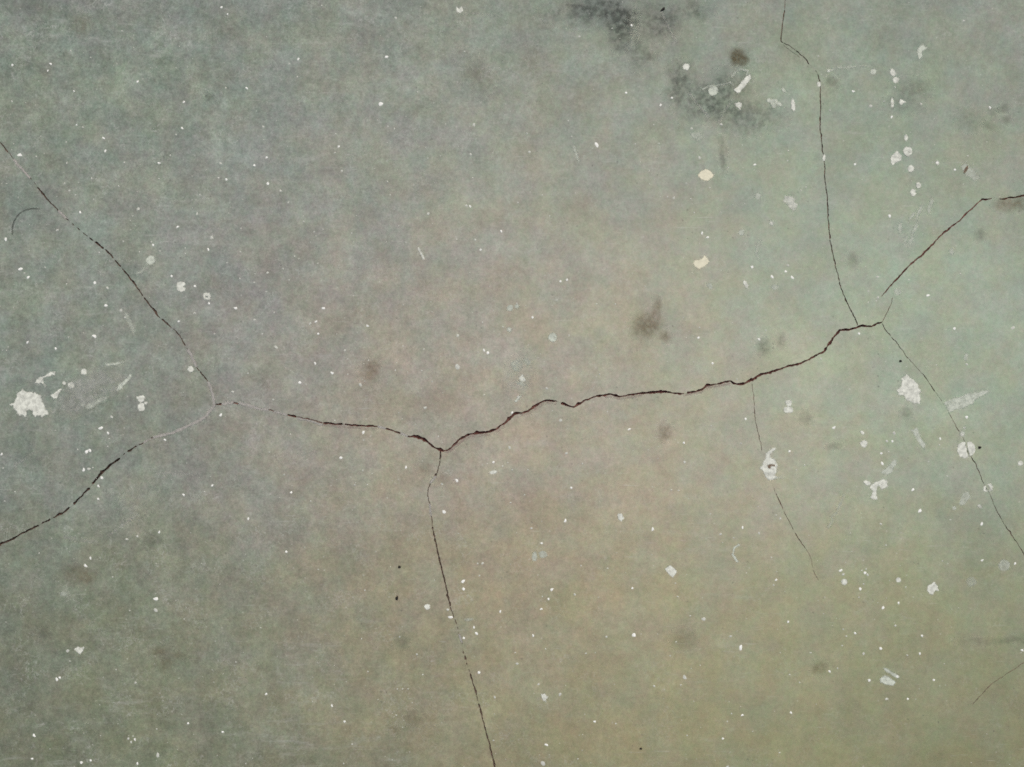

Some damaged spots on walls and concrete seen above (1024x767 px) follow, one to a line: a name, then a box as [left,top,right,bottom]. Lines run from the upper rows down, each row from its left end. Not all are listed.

crack [780,6,809,64]
crack [881,195,1024,297]
crack [0,75,942,664]
crack [949,414,1024,555]
crack [469,671,495,767]